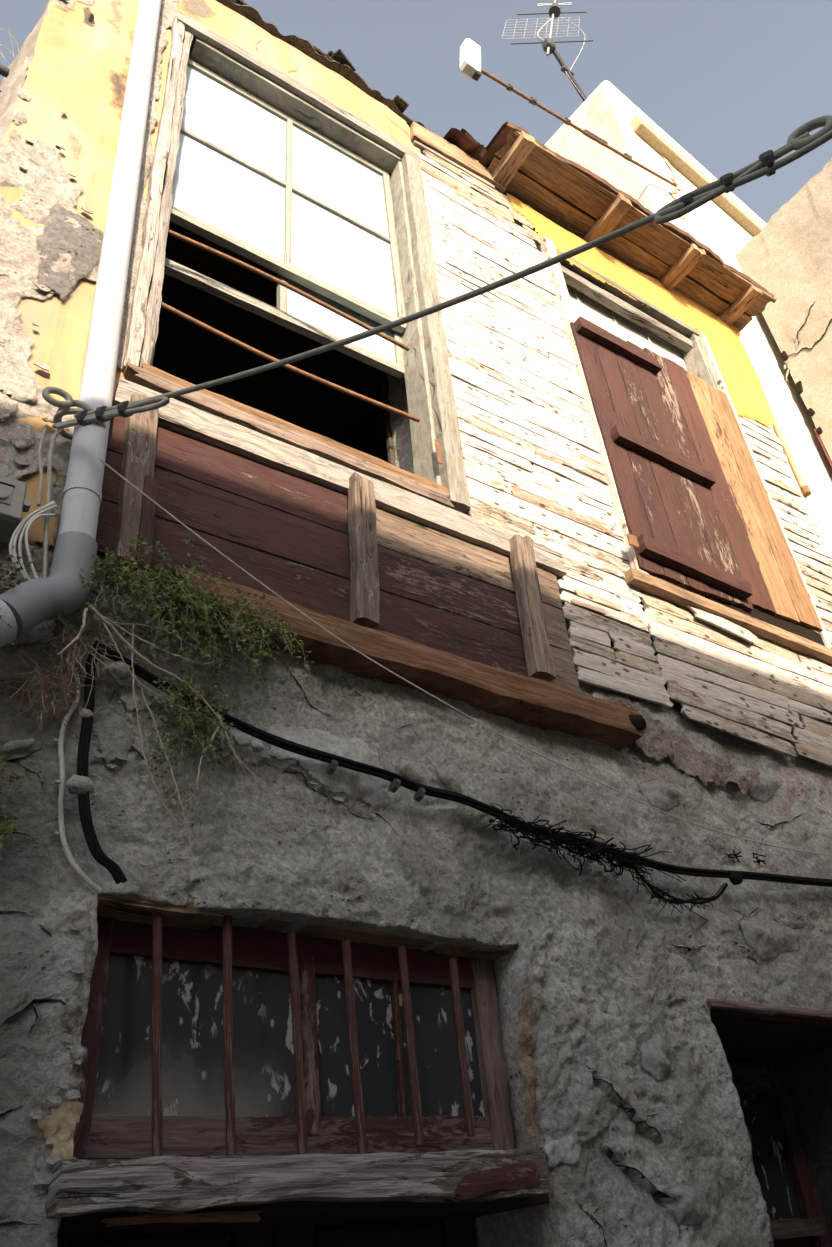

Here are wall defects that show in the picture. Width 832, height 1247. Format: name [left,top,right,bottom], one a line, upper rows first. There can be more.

flaking render [55,0,95,26]
flaking render [0,85,104,543]
crack [784,300,832,381]
flaking render [0,543,53,595]
flaking render [604,690,760,799]
crack [0,993,68,1034]
flaking render [29,912,94,1195]
crack [0,1104,23,1116]
crack [586,1065,667,1148]
crack [598,1142,678,1202]